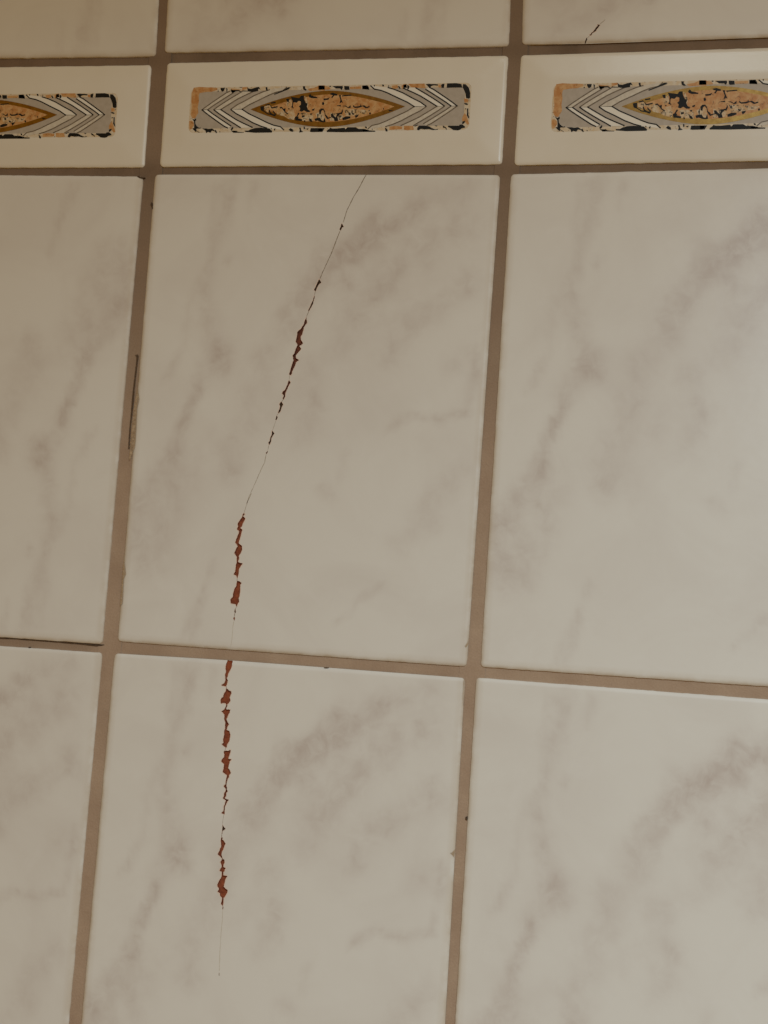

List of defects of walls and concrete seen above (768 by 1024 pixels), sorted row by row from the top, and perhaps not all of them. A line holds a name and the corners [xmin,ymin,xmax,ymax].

crack [217,175,366,970]